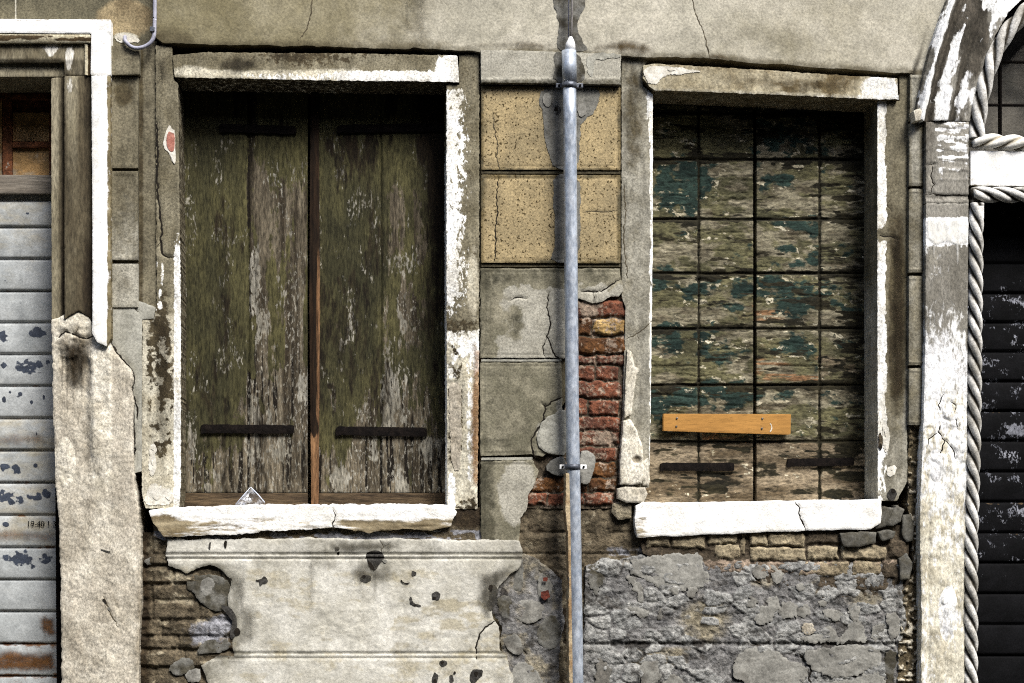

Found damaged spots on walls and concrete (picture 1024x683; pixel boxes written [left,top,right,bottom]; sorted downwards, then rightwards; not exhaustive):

peeling [643,66,700,84]
crack [155,122,174,258]
flaking render [163,125,176,164]
crack [492,117,500,261]
water stain [65,344,86,386]
crack [511,294,561,361]
flaking render [527,403,567,509]
flaking render [578,299,625,509]
crack [926,394,958,457]
flaking render [141,532,241,683]
crack [475,620,496,659]
flaking render [488,553,565,683]